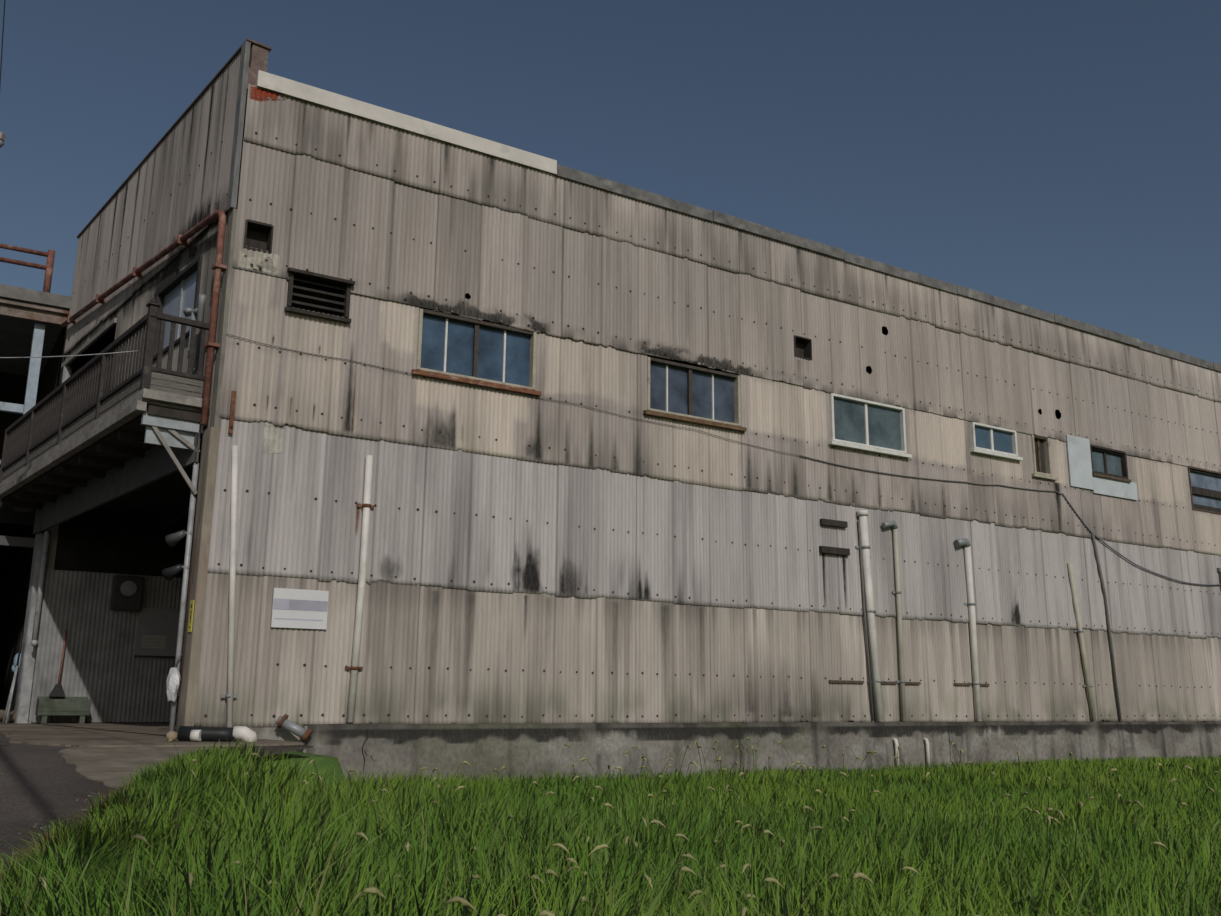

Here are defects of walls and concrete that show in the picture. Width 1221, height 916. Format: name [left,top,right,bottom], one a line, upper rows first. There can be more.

damp [434,415,455,447]
damp [515,553,539,599]
damp [638,581,649,599]